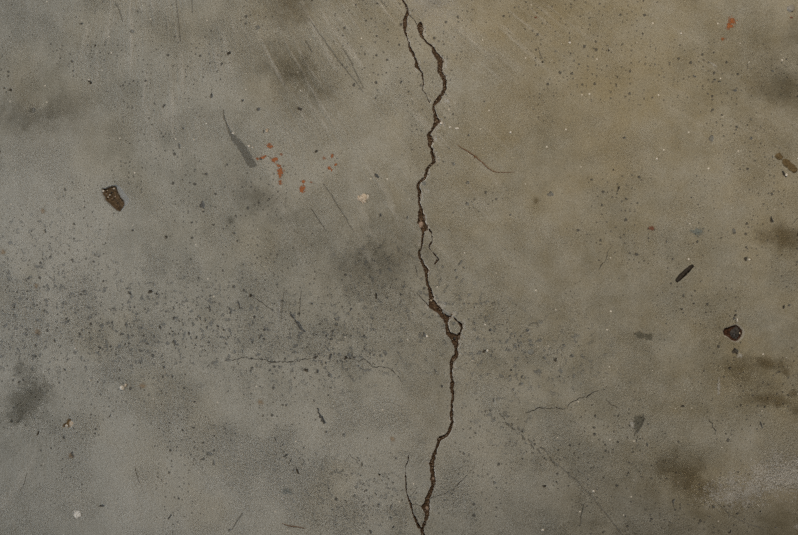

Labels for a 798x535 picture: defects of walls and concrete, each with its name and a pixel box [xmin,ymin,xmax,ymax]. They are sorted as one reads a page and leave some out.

corrosion [256,143,283,185]
crack [402,0,477,535]
crack [226,352,322,363]
crack [346,358,403,384]